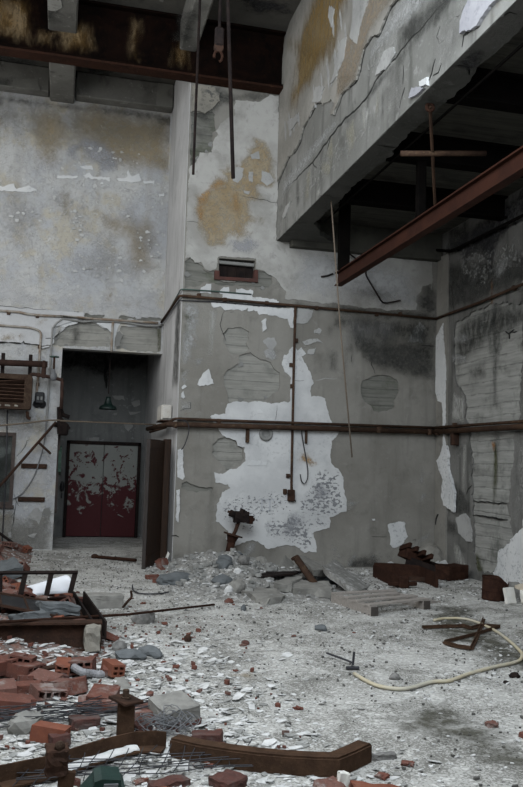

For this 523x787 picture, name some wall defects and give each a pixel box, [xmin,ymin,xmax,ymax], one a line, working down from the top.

corrosion [0,0,27,37]
peeling [48,0,62,11]
damp [293,0,343,99]
damp [337,0,448,92]
peeling [459,0,500,34]
crack [239,0,480,203]
peeling [0,183,38,193]
peeling [57,153,155,185]
damp [196,139,272,251]
peeling [175,0,433,553]
peeling [0,306,162,353]
spalling [435,303,523,584]